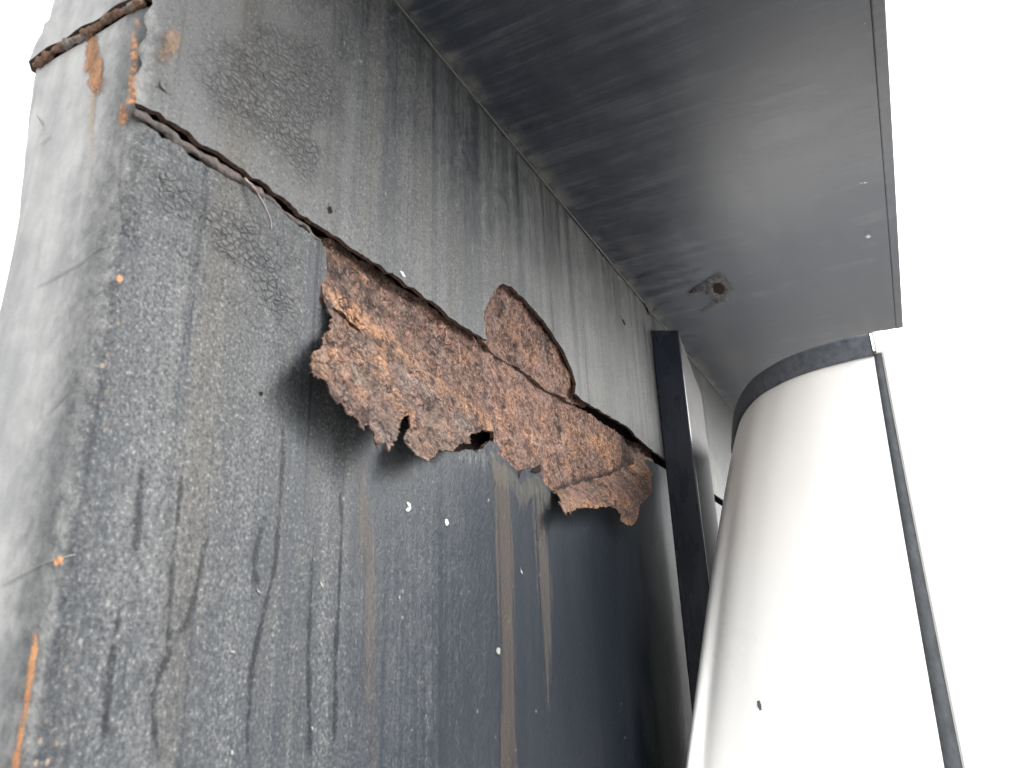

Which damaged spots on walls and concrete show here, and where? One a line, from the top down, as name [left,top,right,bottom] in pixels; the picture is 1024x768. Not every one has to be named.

rust [84,36,103,121]
rust [119,20,138,125]
crack [129,106,478,341]
peeling [689,282,725,313]
rust [309,234,654,526]
crack [575,405,666,469]
rust [12,634,38,768]